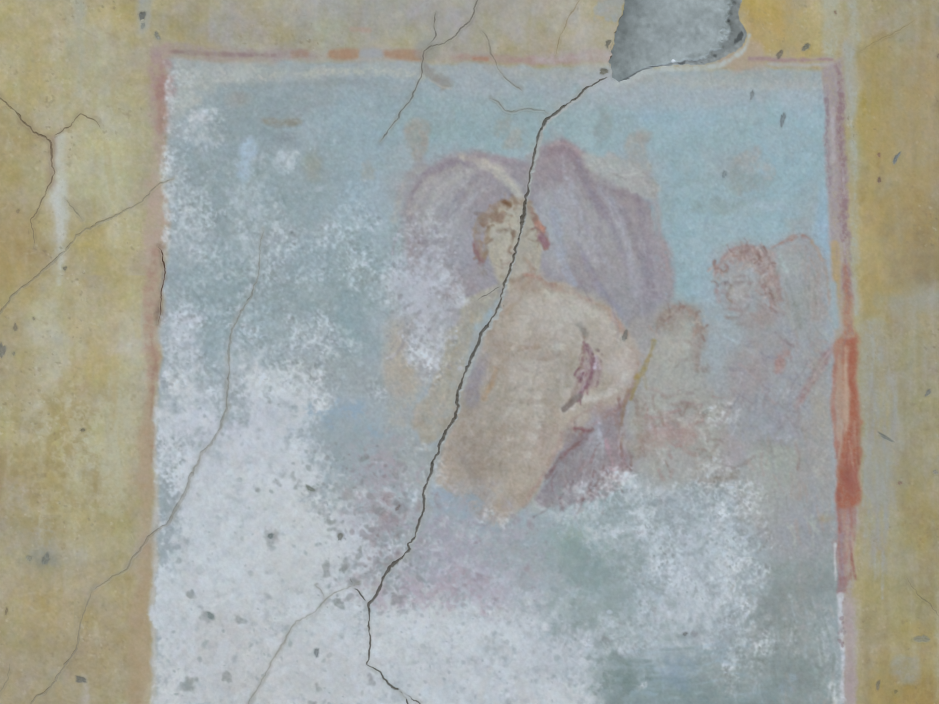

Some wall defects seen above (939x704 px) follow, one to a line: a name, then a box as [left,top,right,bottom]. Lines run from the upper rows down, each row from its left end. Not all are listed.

crack [0,95,175,317]
crack [28,228,266,704]
crack [246,0,609,704]
flaking render [572,0,749,105]